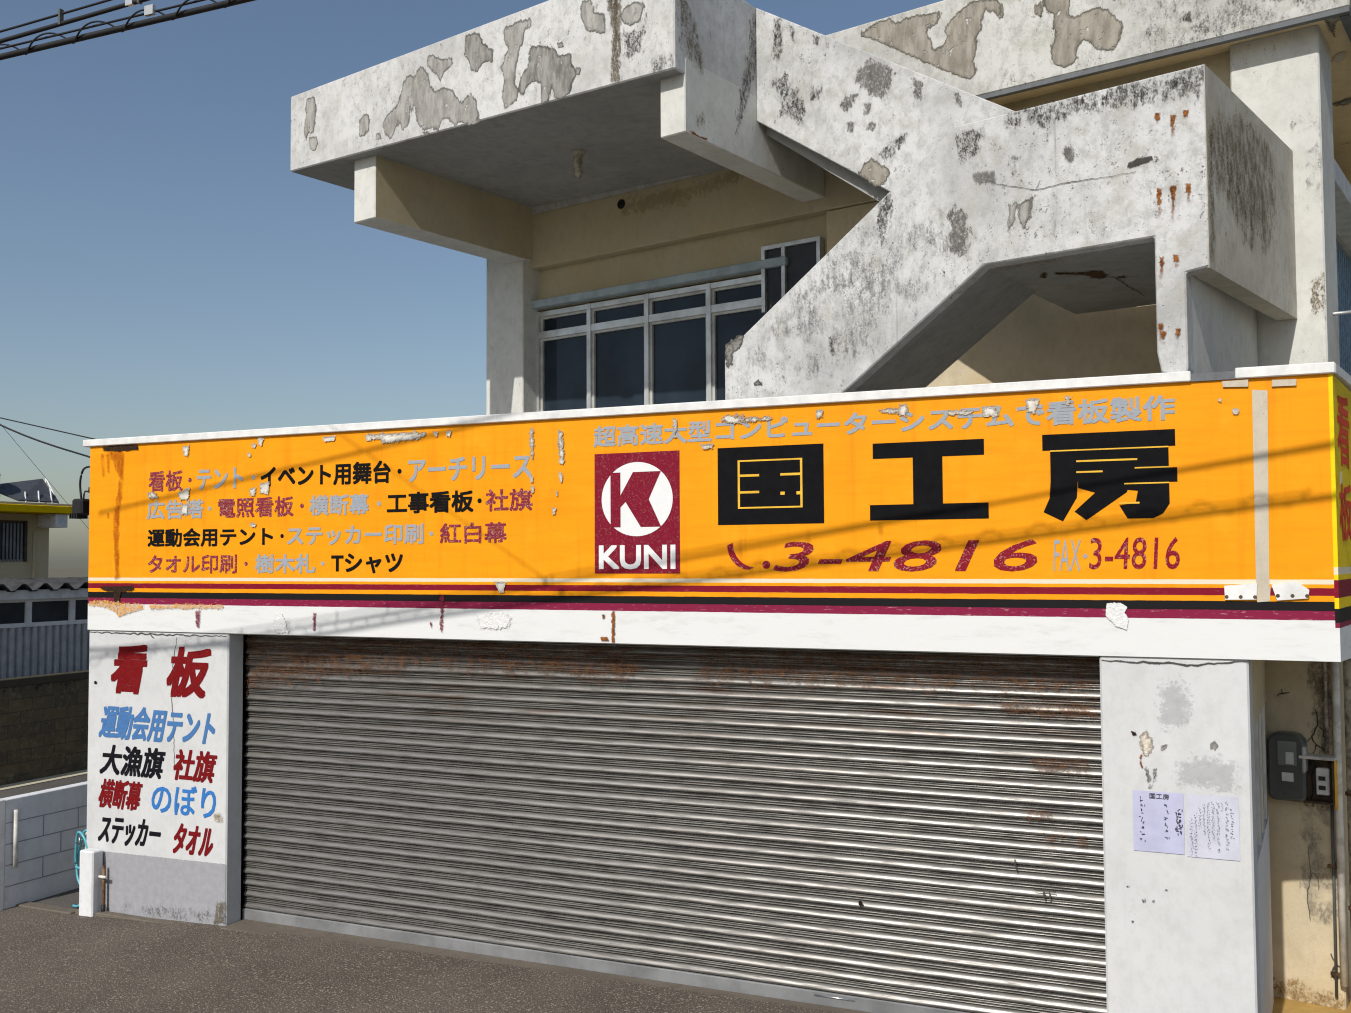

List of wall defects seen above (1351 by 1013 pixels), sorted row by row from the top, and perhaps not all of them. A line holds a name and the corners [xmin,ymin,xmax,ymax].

peeling [860,0,1004,79]
peeling [1034,0,1124,67]
water stain [1173,0,1275,40]
peeling [359,17,581,140]
water stain [1005,68,1204,128]
rust [1154,110,1188,130]
water stain [955,129,995,184]
rust [1156,183,1191,210]
water stain [1207,109,1276,258]
spalling [1131,730,1167,756]